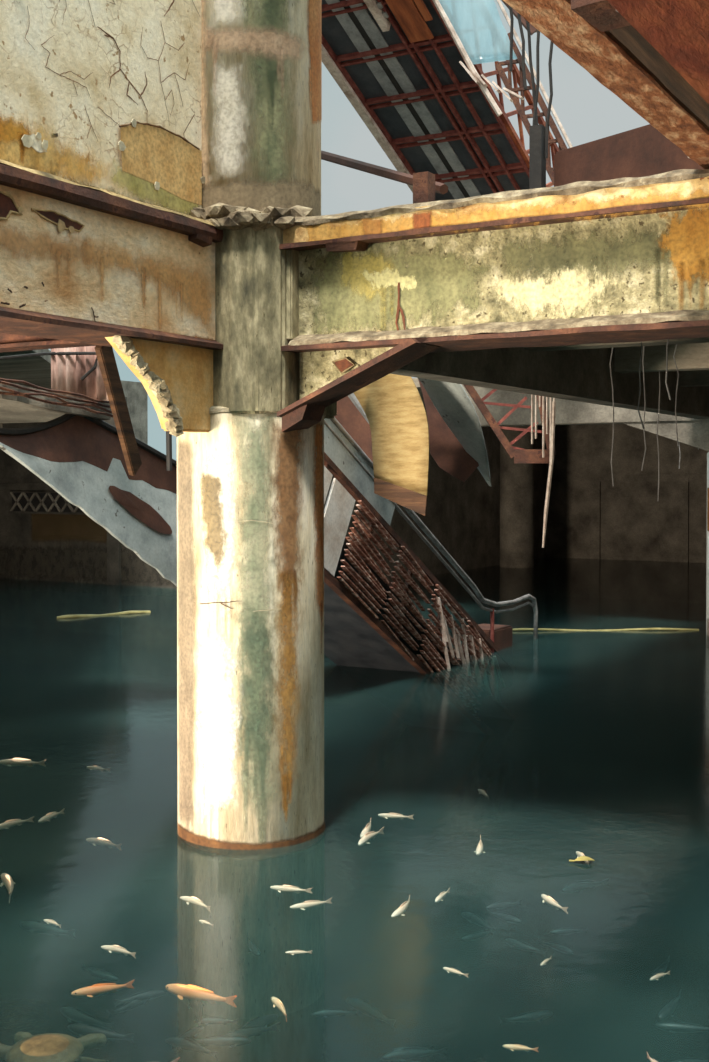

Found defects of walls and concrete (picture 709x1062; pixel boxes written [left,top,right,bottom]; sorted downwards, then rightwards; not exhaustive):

flaking render [21,132,48,152]
crack [25,0,200,141]
leakage [0,0,321,216]
flaking render [118,118,205,205]
flaking render [0,191,85,233]
leakage [308,242,490,334]
leakage [495,225,671,298]
rust [314,423,324,616]
rust [275,429,302,815]